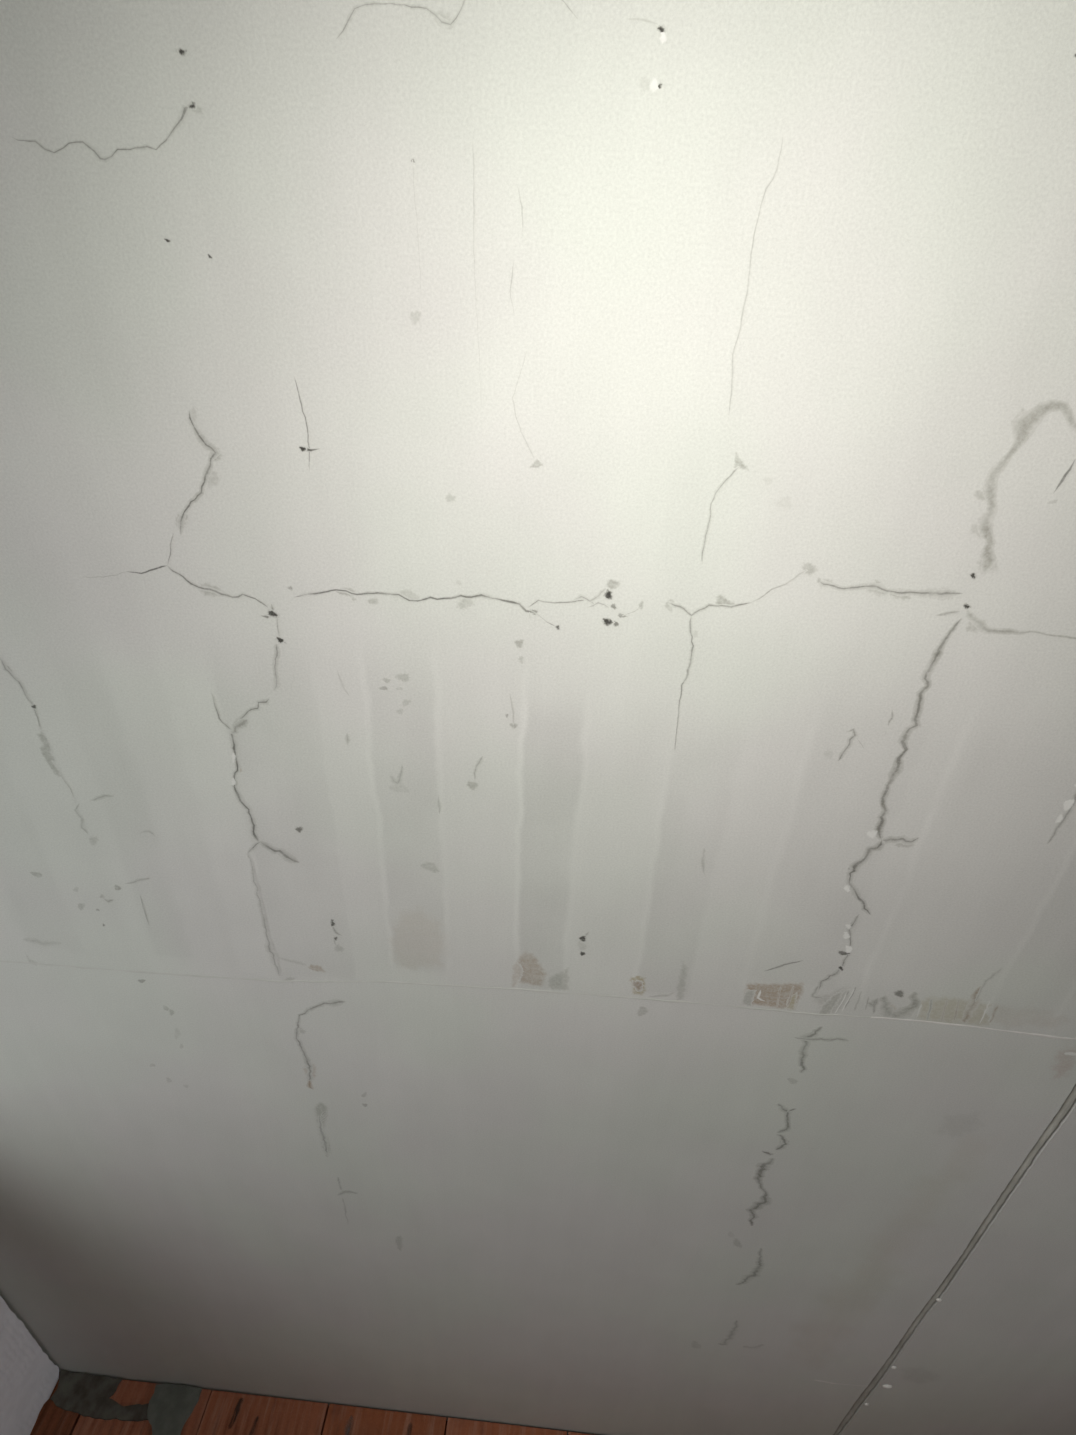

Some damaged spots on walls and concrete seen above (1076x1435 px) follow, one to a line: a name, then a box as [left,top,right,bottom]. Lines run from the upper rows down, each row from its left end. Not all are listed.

crack [336,0,470,40]
crack [12,104,189,163]
crack [728,134,783,416]
crack [85,406,594,631]
crack [0,658,100,847]
crack [72,877,151,927]
crack [211,643,299,976]
crack [662,451,1076,1285]
crack [293,998,346,1090]